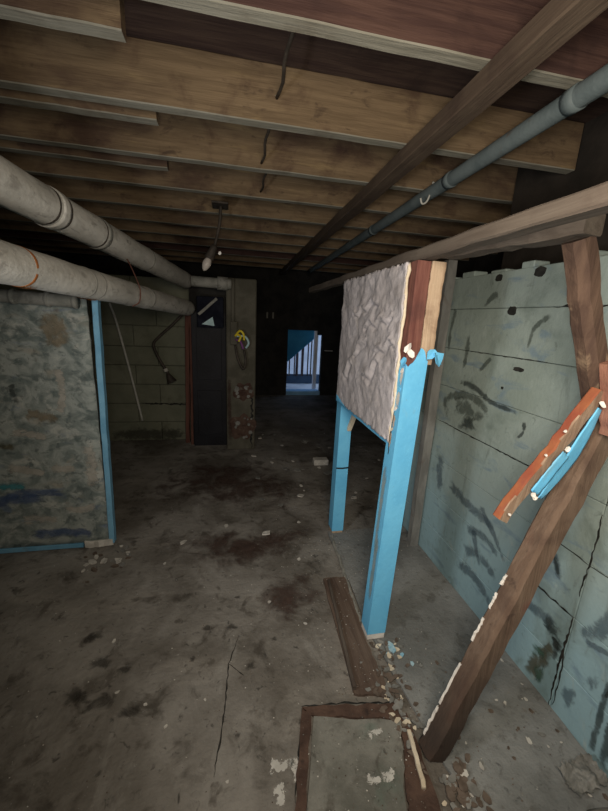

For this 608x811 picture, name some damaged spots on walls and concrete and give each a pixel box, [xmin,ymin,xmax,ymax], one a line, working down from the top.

crack [538,501,608,705]
crack [214,639,243,775]